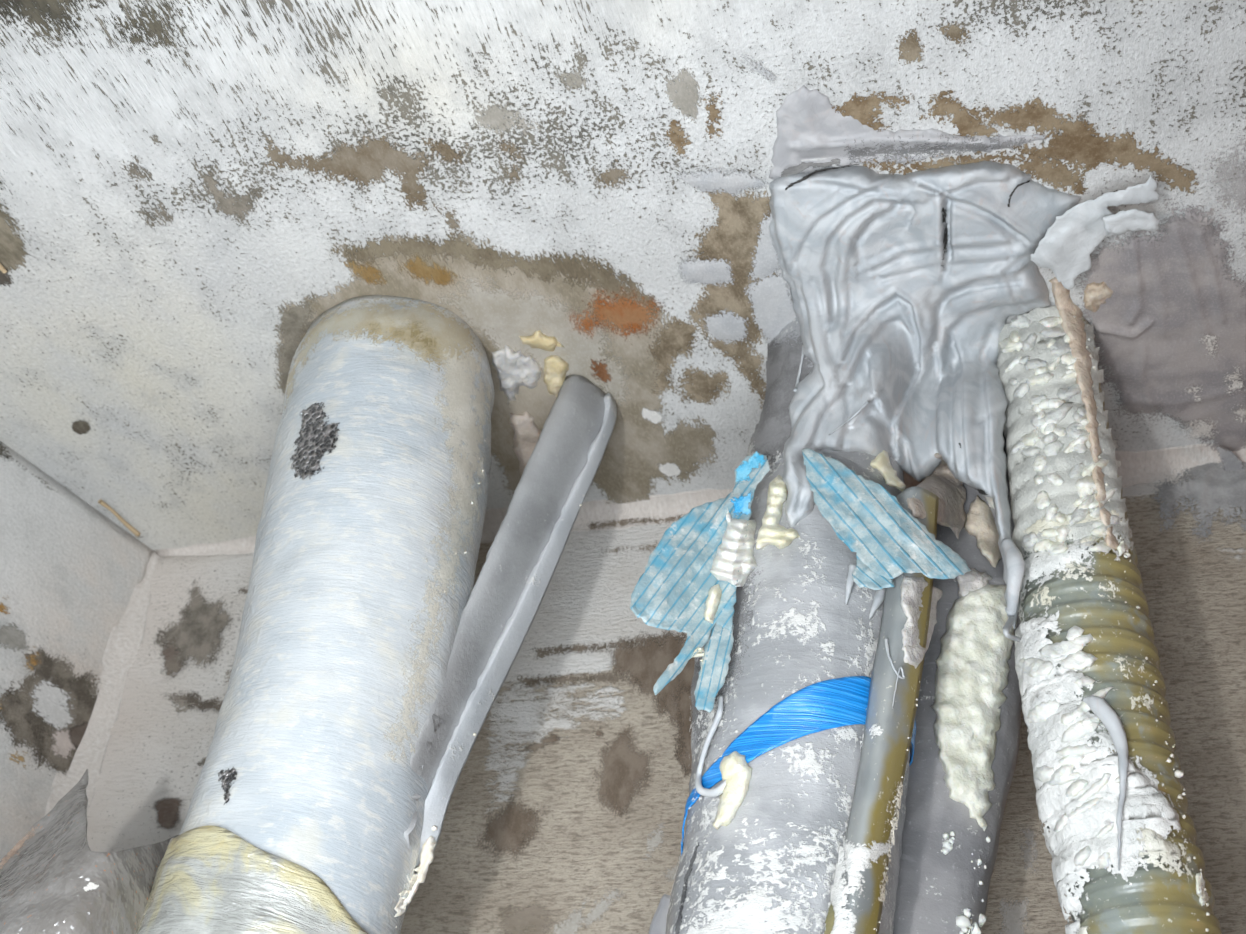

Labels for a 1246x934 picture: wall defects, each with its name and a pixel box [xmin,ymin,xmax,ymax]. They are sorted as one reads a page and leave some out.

mould [0,0,207,71]
leakage [117,154,152,190]
leakage [137,202,173,229]
leakage [199,161,266,221]
leakage [262,131,470,239]
leakage [495,134,526,187]
leakage [590,159,632,189]
leakage [663,89,724,159]
leakage [831,90,914,132]
leakage [860,87,1199,196]
corrosion [570,287,660,339]
leakage [151,579,234,686]